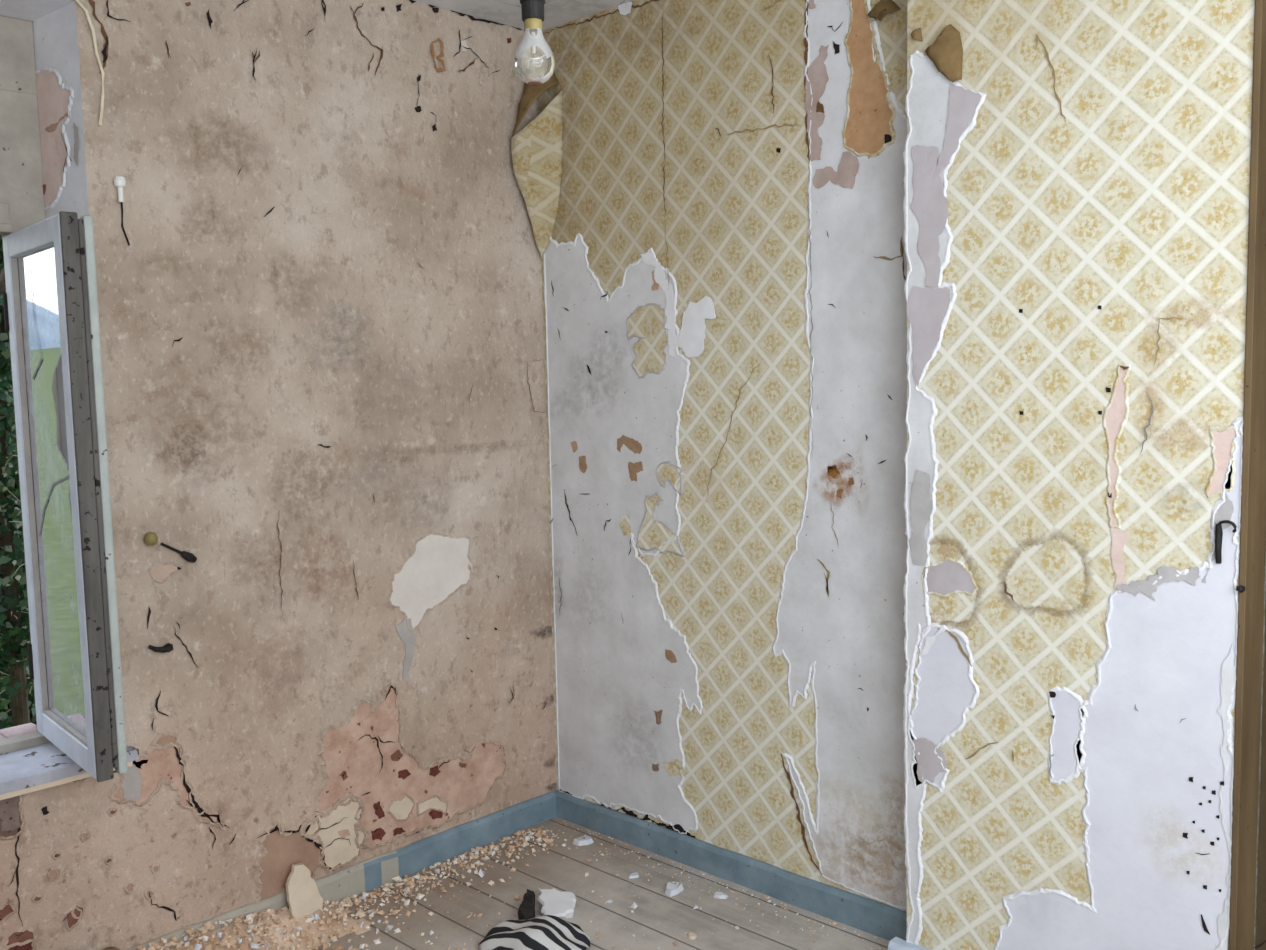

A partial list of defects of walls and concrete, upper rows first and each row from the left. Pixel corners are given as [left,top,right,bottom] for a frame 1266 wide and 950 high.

flaking render [34,66,80,210]
peeling [907,83,982,387]
peeling [640,251,716,358]
peeling [909,470,933,566]
leakage [1002,563,1069,613]
flaking render [254,532,507,903]
peeling [913,738,947,786]
flaking render [0,795,26,841]
crack [187,800,215,823]
flaking render [600,802,695,838]
crack [149,892,179,921]